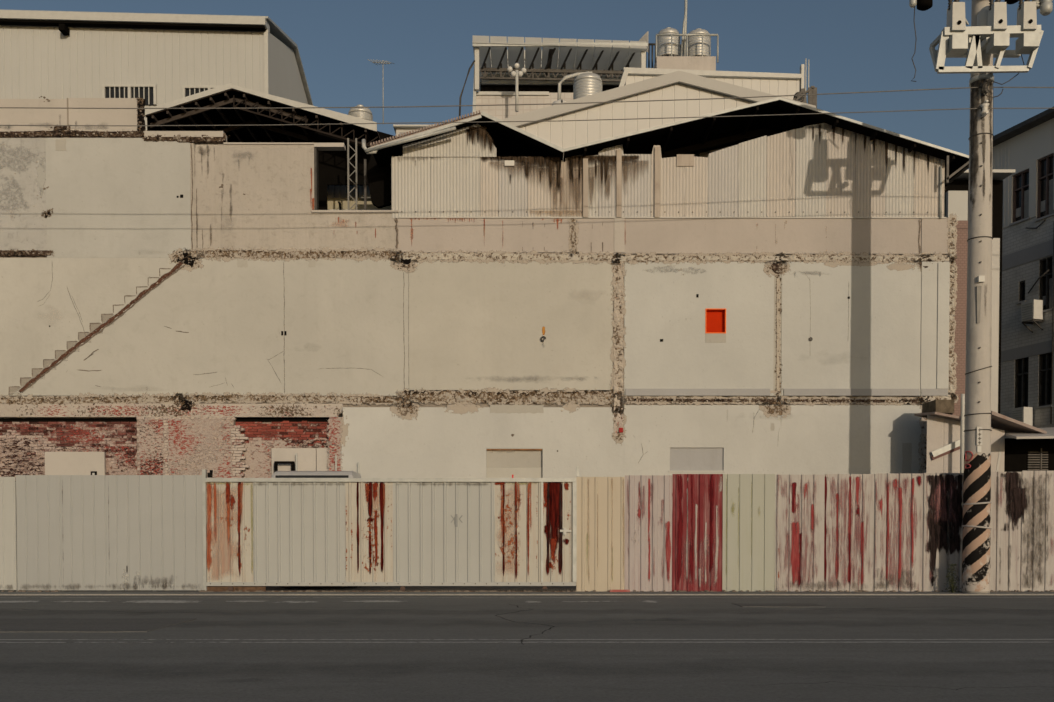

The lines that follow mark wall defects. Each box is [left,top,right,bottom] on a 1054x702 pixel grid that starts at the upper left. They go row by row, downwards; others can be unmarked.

leakage [467,126,643,203]
spalling [0,213,959,590]
corrosion [207,482,250,577]
corrosion [345,482,392,573]
corrosion [495,482,571,577]
leakage [927,474,964,586]
leakage [996,472,1053,588]